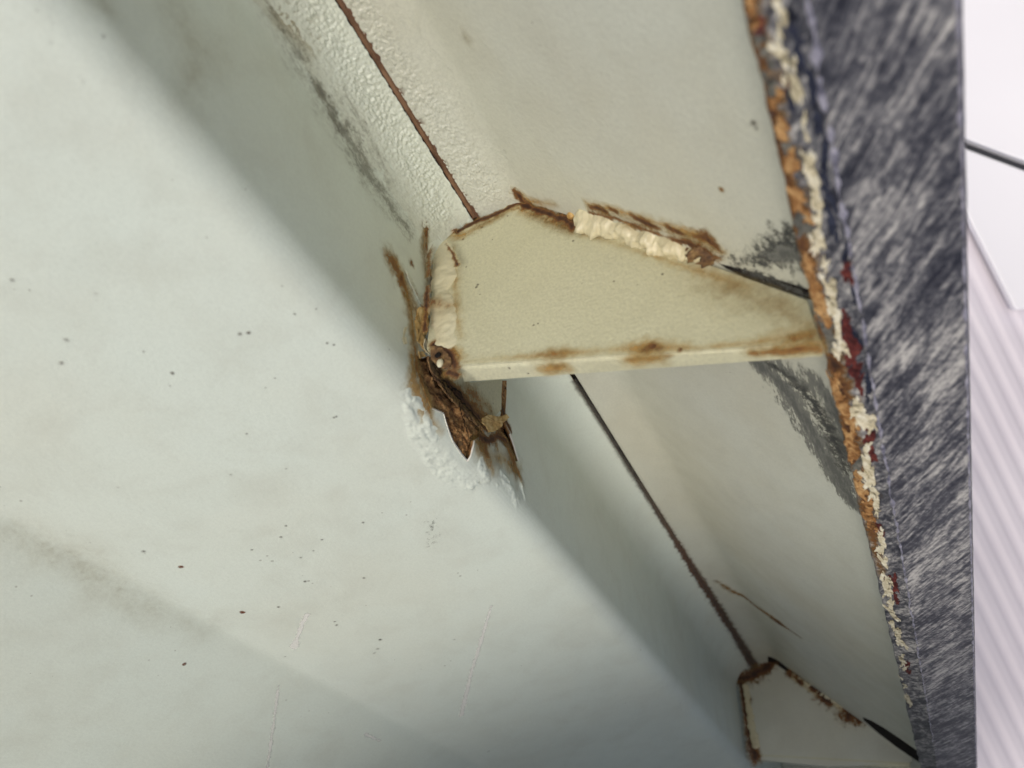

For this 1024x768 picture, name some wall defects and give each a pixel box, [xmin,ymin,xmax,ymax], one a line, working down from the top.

corrosion [385,221,522,481]
corrosion [336,0,576,267]
corrosion [588,205,723,262]
corrosion [632,342,682,360]
corrosion [570,374,865,766]
corrosion [743,0,820,290]
peeling [721,0,913,708]
corrosion [749,307,885,578]